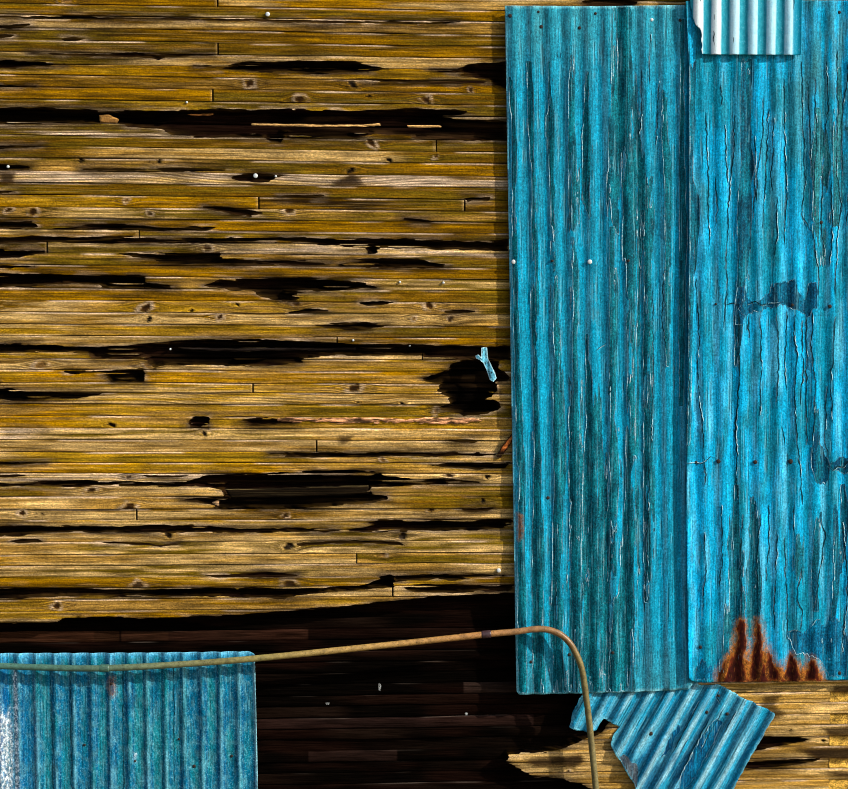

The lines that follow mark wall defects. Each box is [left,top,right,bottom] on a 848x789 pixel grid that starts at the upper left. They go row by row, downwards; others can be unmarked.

crack [638,35,660,146]
peeling [733,59,818,366]
crack [651,268,666,444]
crack [686,52,848,652]
peeling [811,402,848,484]
crack [642,468,650,610]
peeling [695,485,762,681]
corrosion [717,619,824,682]
peeling [787,484,848,678]